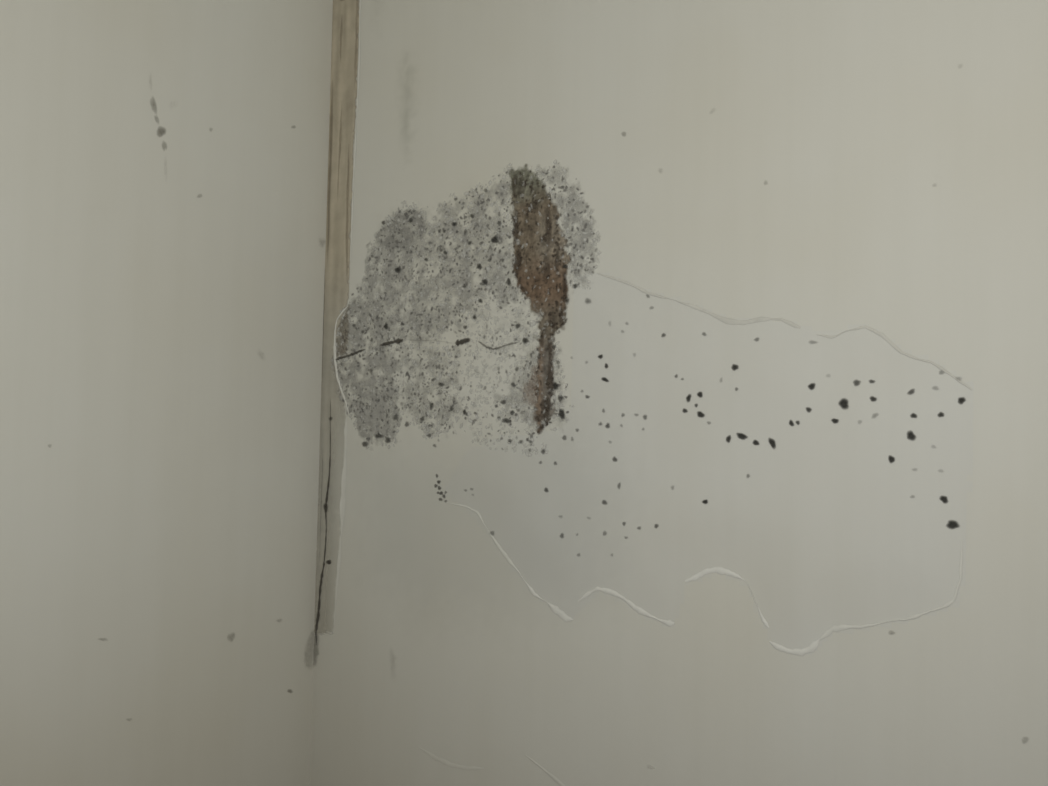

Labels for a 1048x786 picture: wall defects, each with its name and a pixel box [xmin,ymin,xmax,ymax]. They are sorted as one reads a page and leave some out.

rust [510,164,570,433]
crack [315,409,332,642]
leakage [726,433,775,448]